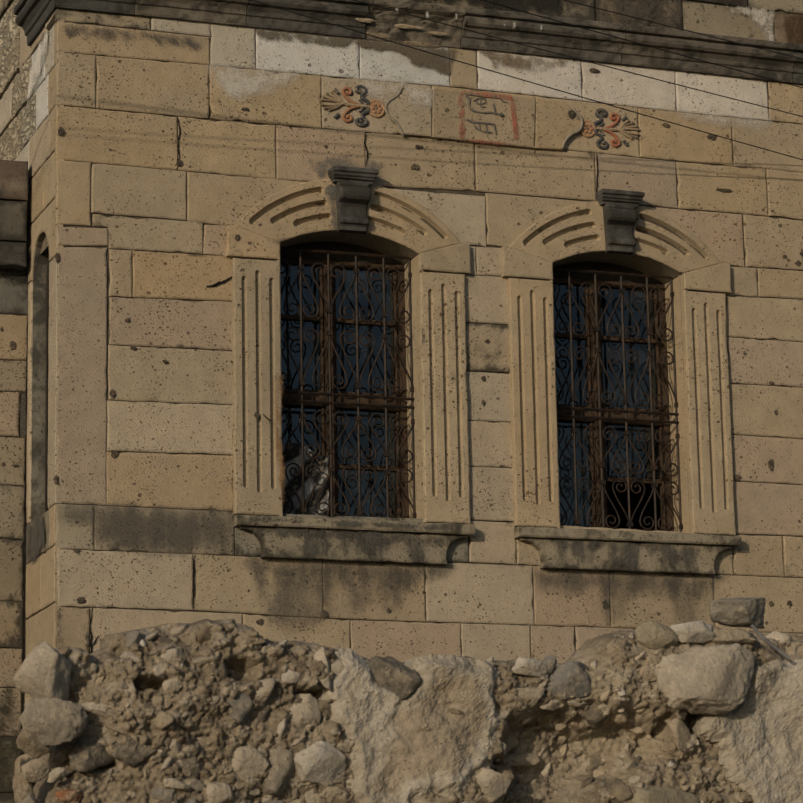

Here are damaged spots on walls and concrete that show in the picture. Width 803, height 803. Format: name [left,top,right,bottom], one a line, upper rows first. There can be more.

leakage [255,28,455,75]
leakage [482,50,564,70]
crack [175,117,183,167]
crack [89,607,99,654]
peeling [113,623,189,679]
peeling [136,618,249,734]
peeling [249,619,320,753]
peeling [762,626,802,660]
peeling [499,632,667,803]
peeling [151,739,182,769]
peeling [490,742,523,803]
peeling [668,740,731,803]